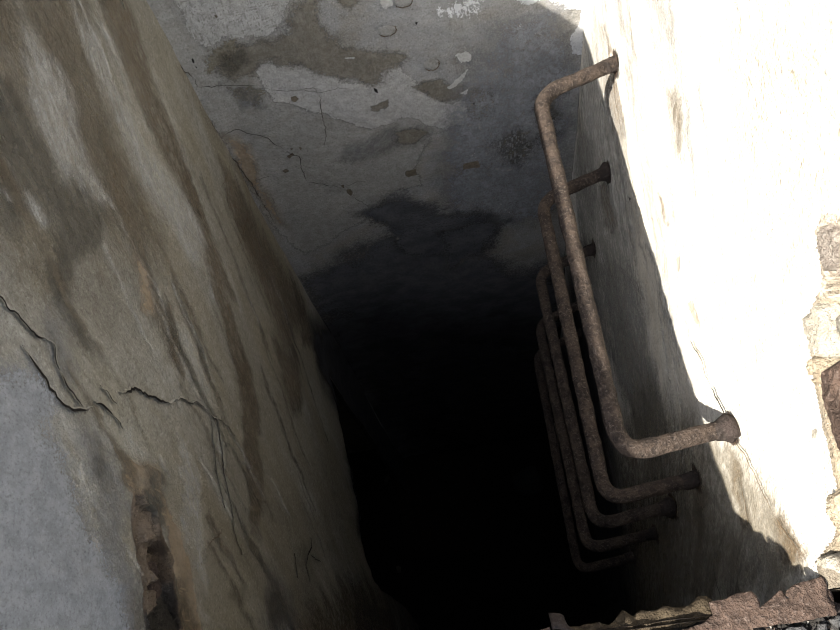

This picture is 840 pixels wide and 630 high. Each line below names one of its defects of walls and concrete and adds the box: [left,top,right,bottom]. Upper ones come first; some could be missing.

peeling [146,0,496,256]
peeling [517,0,586,55]
rust [604,74,625,139]
crack [0,295,243,555]
water stain [0,0,416,630]
water stain [220,0,803,625]
spalling [802,212,840,589]
spalling [131,489,183,630]